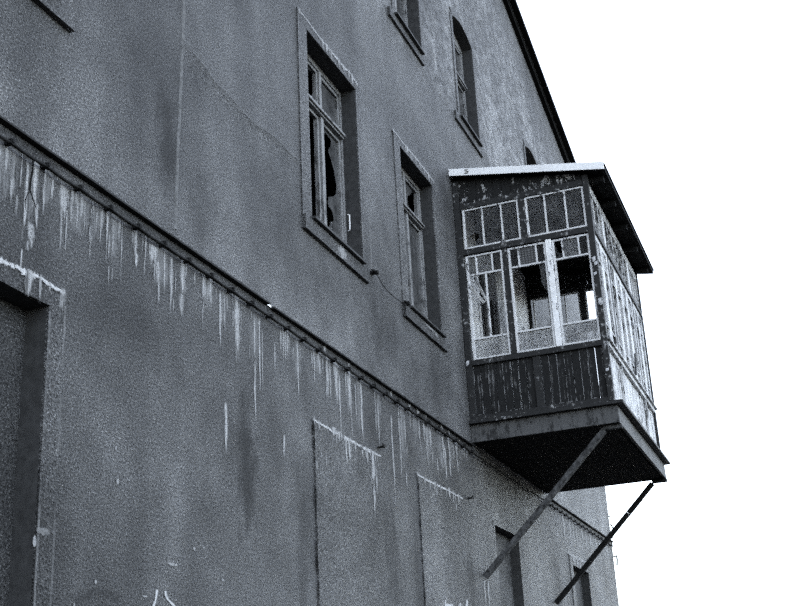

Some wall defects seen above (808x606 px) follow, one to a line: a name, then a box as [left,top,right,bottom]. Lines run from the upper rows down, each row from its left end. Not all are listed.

efflorescence [0,155,122,302]
efflorescence [132,232,240,346]
efflorescence [254,320,263,414]
efflorescence [274,330,299,391]
efflorescence [311,346,381,511]
efflorescence [391,404,467,486]
efflorescence [418,474,462,511]